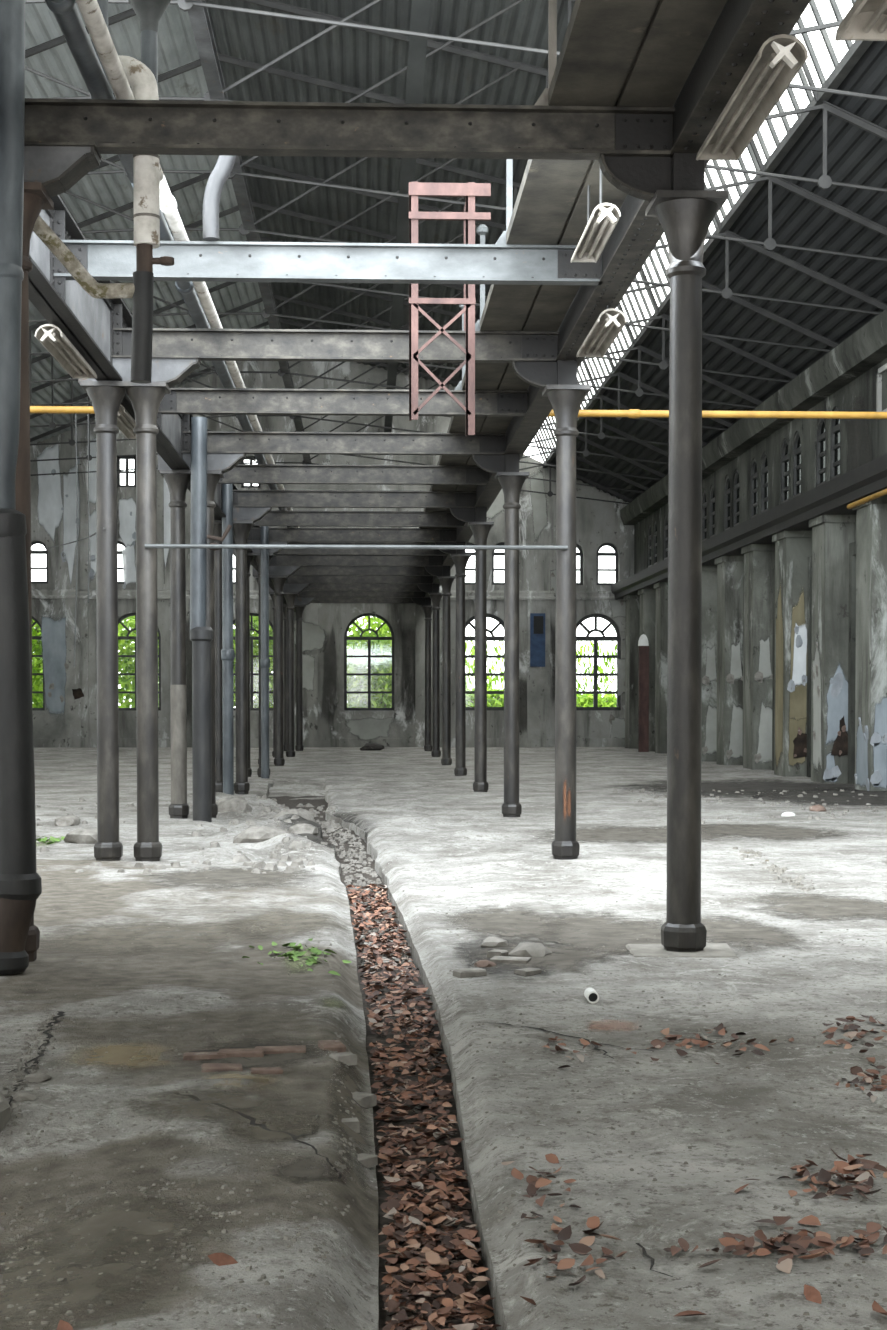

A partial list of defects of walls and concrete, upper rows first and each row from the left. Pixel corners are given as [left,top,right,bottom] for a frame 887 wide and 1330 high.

peeling [787,624,887,791]
water stain [451,908,663,971]
water stain [701,893,887,951]
crack [8,1011,65,1107]